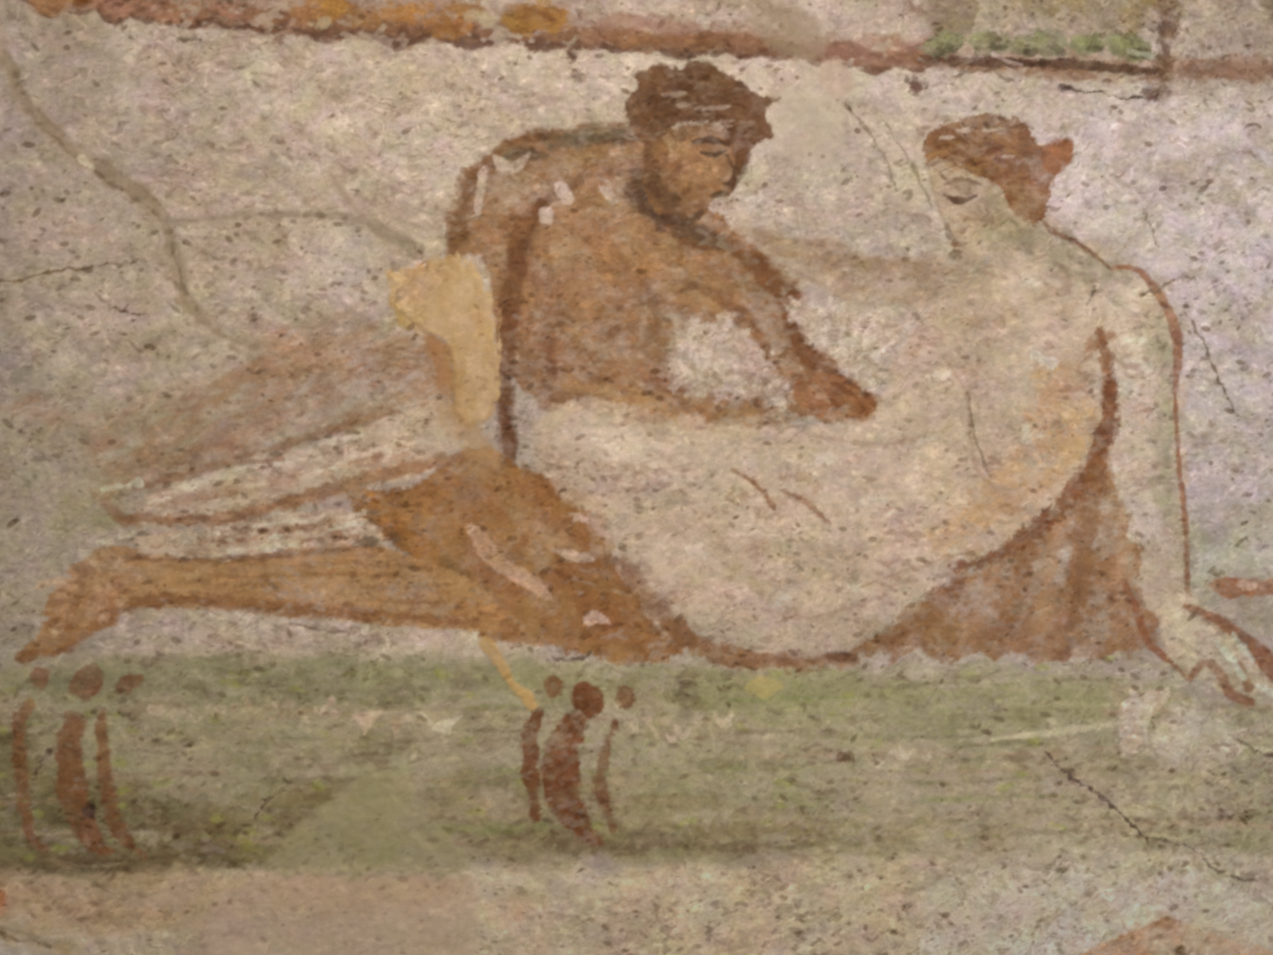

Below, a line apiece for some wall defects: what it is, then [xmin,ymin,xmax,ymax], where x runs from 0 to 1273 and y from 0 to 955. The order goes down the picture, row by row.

crack [0,0,416,355]
crack [1042,746,1259,884]